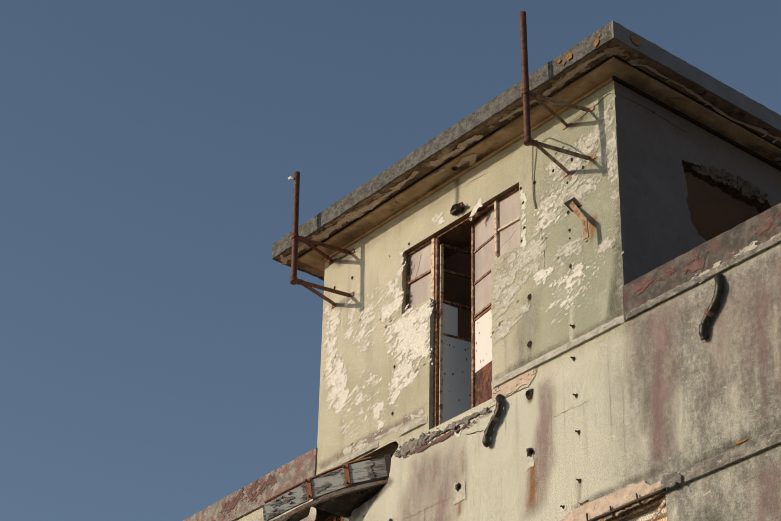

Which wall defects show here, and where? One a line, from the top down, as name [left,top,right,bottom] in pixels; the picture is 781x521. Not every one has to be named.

peeling [490,92,624,346]
spalling [687,162,768,204]
peeling [634,251,721,295]
peeling [322,243,434,455]
spalling [394,368,538,458]
spalling [560,472,683,521]